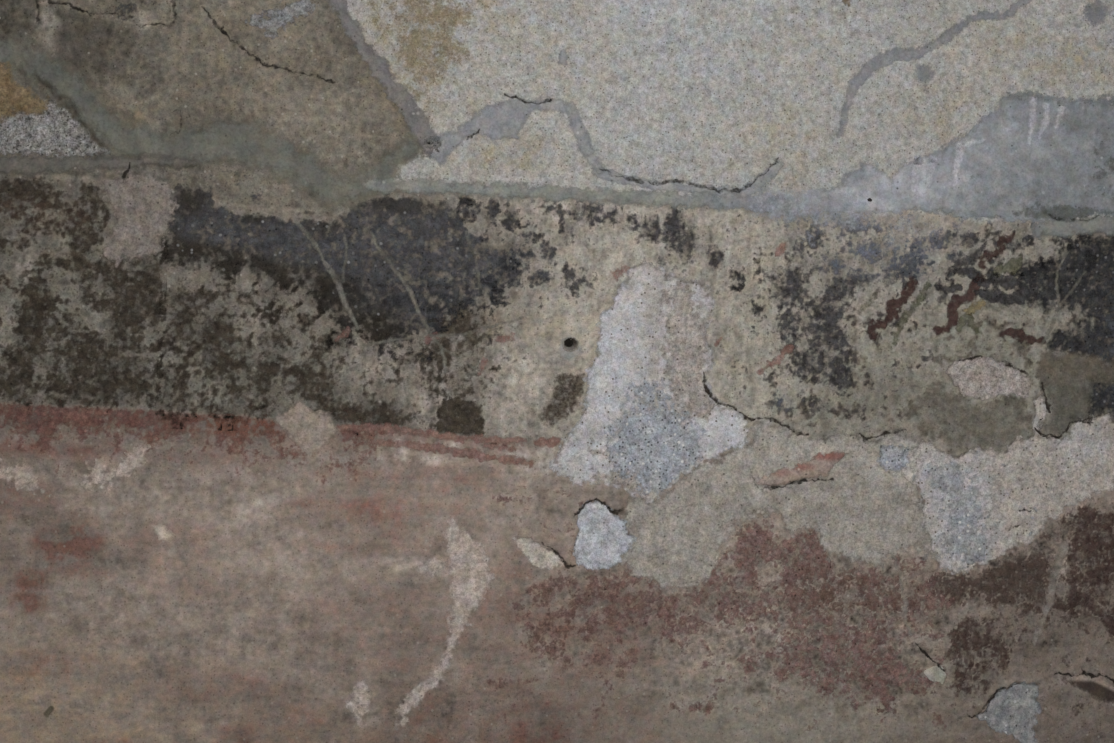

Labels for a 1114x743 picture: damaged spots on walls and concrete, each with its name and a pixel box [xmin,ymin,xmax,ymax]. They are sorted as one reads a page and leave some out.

crack [36,0,177,25]
crack [203,7,334,83]
spalling [0,99,110,158]
flaking render [512,200,1114,590]
crack [1055,670,1114,683]
spalling [969,681,1041,743]